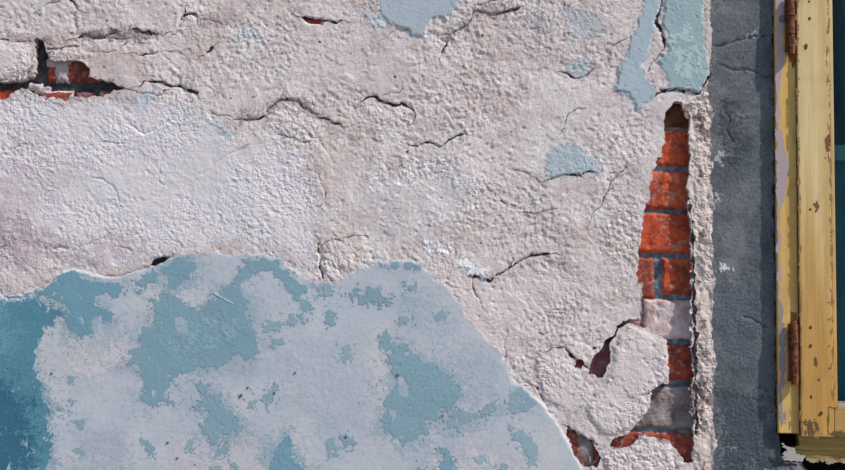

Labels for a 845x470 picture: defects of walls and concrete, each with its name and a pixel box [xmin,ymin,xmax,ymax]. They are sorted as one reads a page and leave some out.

crack [440,0,532,64]
flaking render [0,40,124,101]
crack [0,0,416,212]
crack [401,133,477,148]
peeling [544,139,600,183]
crack [513,164,635,229]
crack [314,235,369,281]
crack [468,252,566,312]
flaking render [575,0,715,470]
peeling [0,248,544,470]
flaking render [566,428,601,467]
peeling [781,443,845,465]